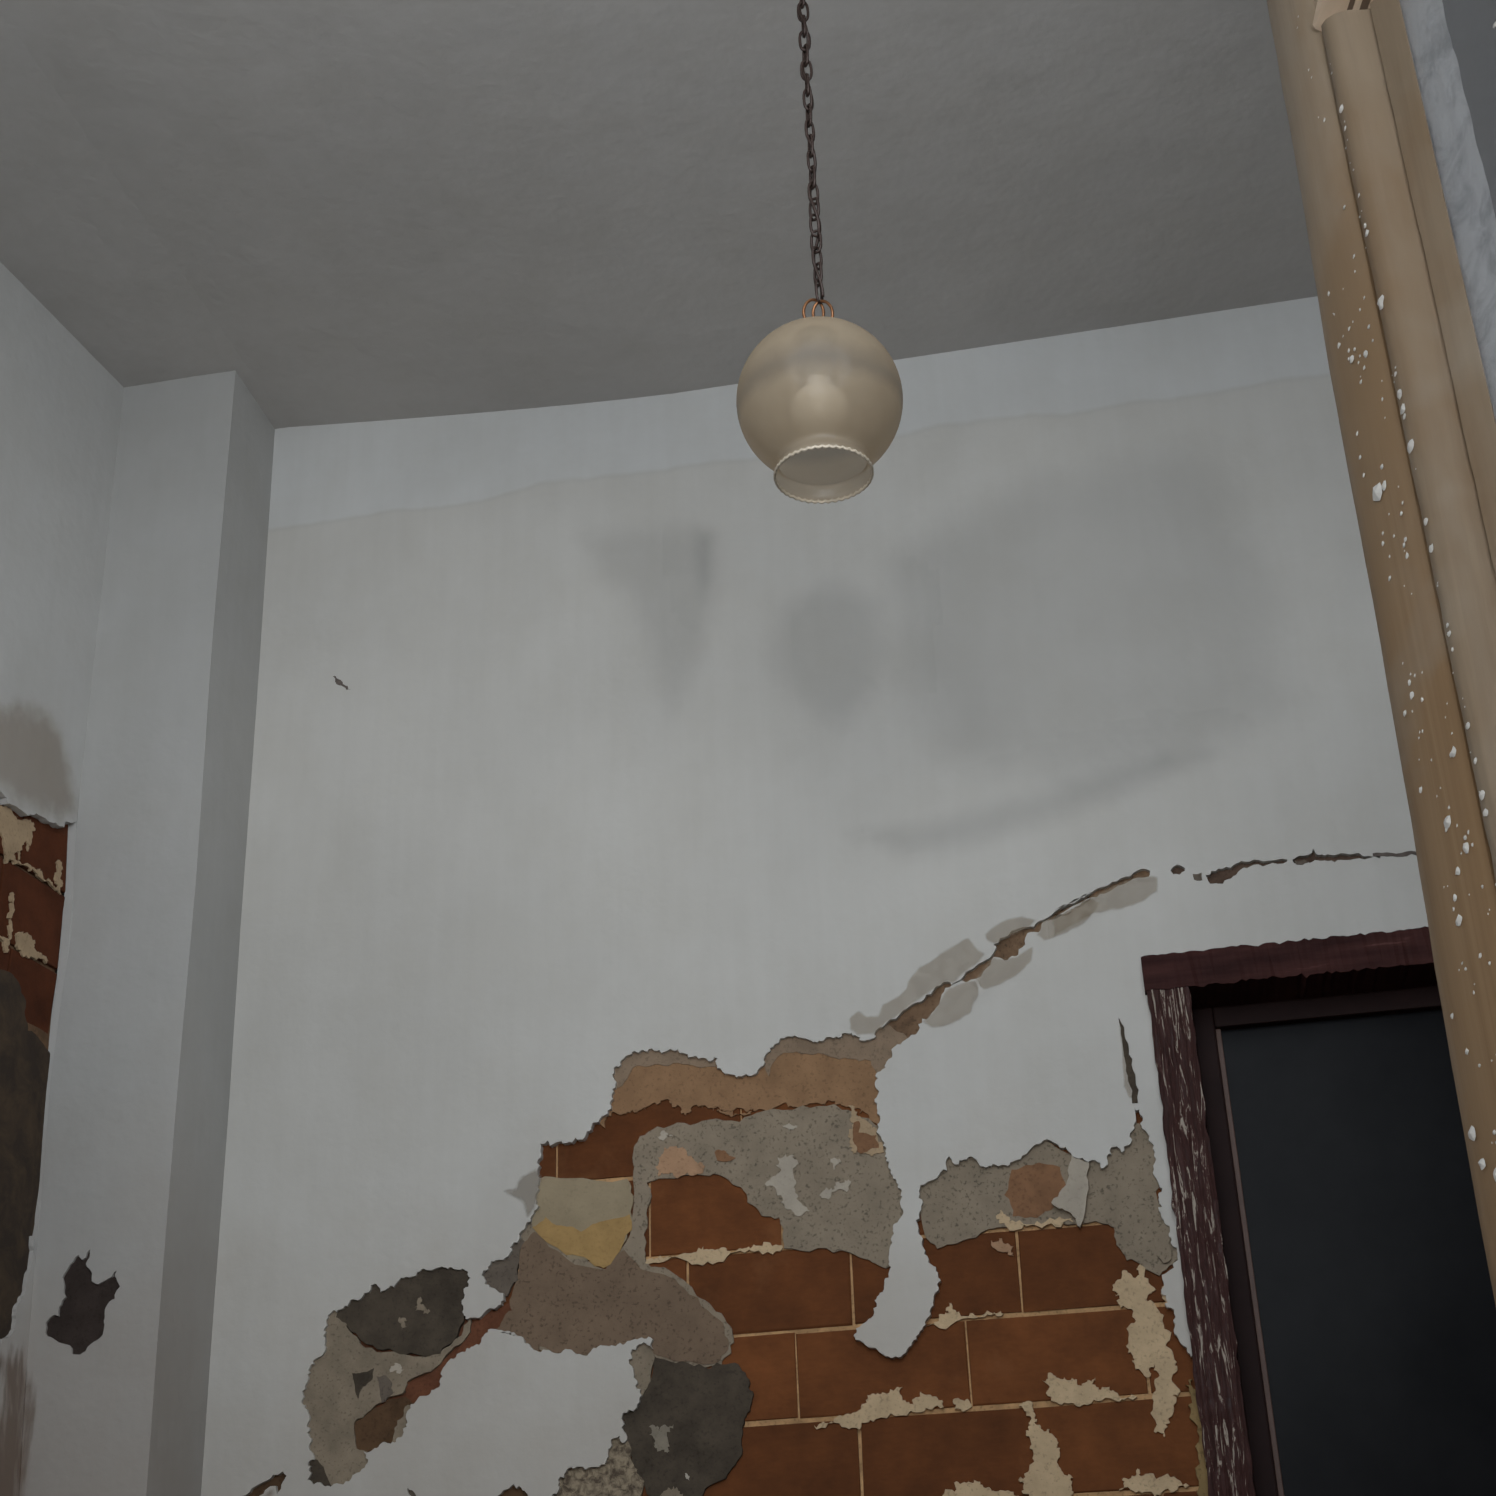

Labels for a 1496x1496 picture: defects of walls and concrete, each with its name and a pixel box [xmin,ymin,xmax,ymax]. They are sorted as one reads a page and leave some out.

spalling [0,805,68,1339]
spalling [47,1252,120,1355]
spalling [248,1473,286,1496]
spalling [303,1024,1208,1496]